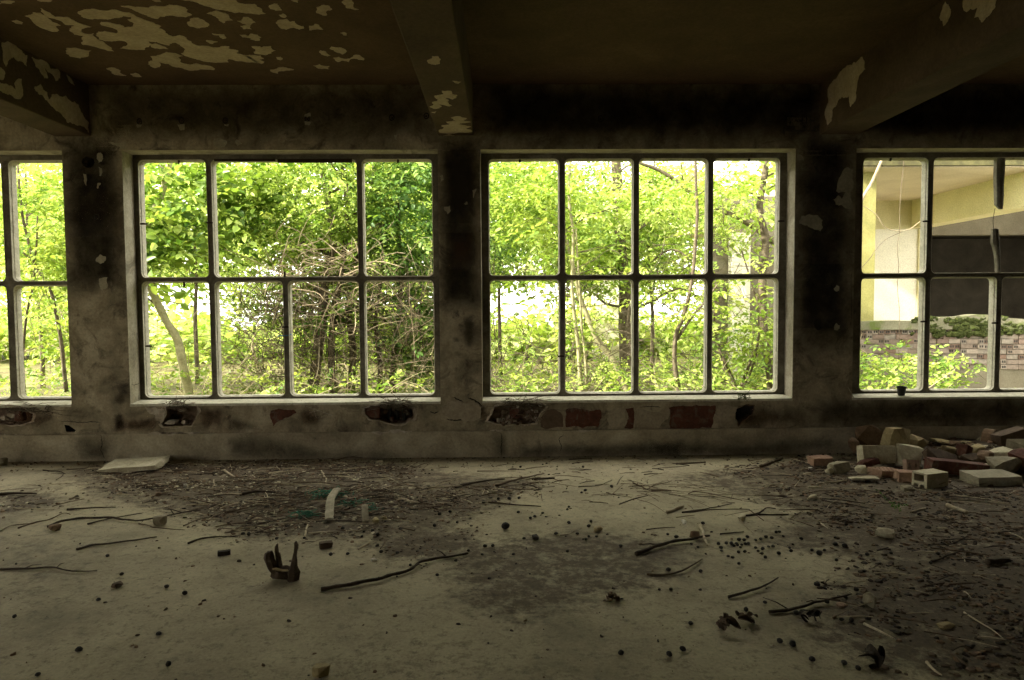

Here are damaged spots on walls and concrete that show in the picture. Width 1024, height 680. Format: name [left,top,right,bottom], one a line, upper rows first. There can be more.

peeling [939,0,996,26]
peeling [12,0,364,74]
peeling [0,41,89,133]
peeling [430,81,472,136]
peeling [825,57,865,125]
spalling [833,167,854,209]
flaking render [270,409,296,426]
spalling [361,404,417,426]
spalling [485,400,602,429]
flaking render [669,405,716,429]